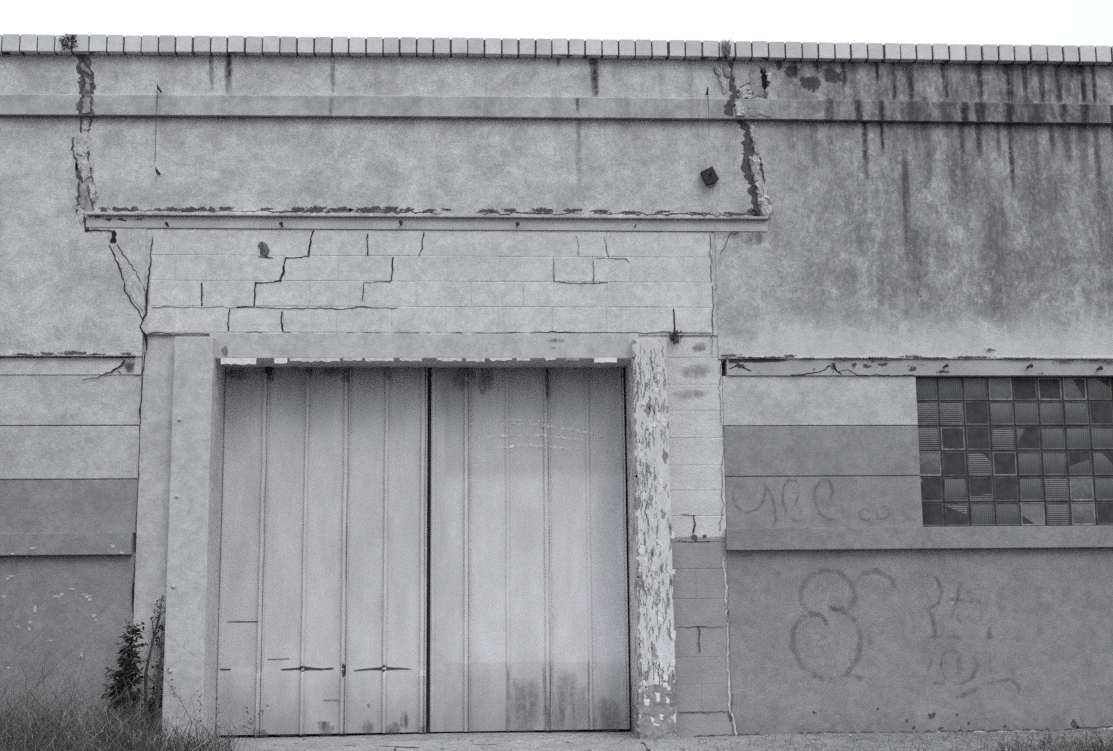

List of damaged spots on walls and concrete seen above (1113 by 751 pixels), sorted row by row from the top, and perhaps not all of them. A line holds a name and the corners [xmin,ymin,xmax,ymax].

leakage [760,61,846,92]
leakage [855,62,921,159]
leakage [940,63,1100,179]
crack [71,55,424,618]
crack [456,62,773,735]
peeling [632,340,681,739]